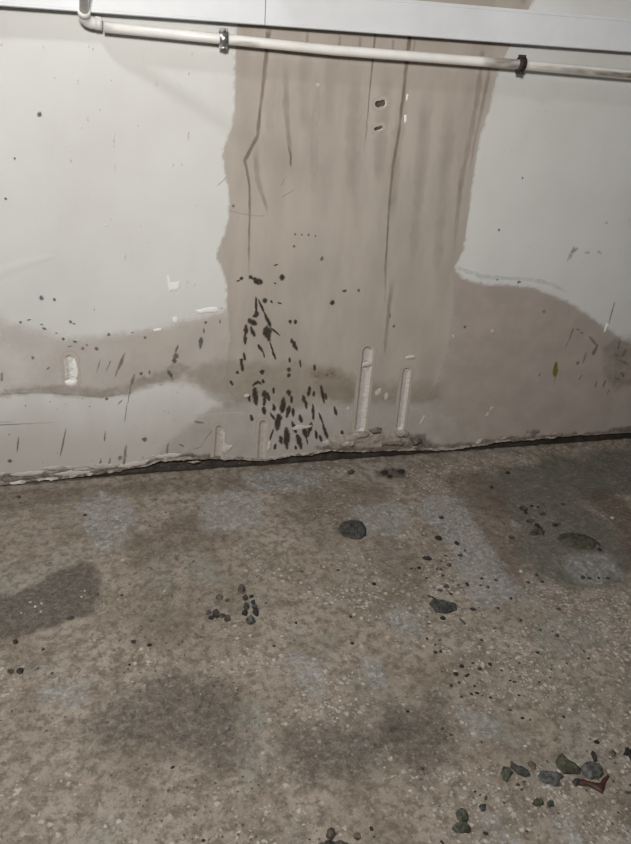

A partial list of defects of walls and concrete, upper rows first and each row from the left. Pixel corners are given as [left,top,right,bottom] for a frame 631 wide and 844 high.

leakage [419,0,532,10]
leakage [46,24,631,459]
flaking render [0,432,557,485]